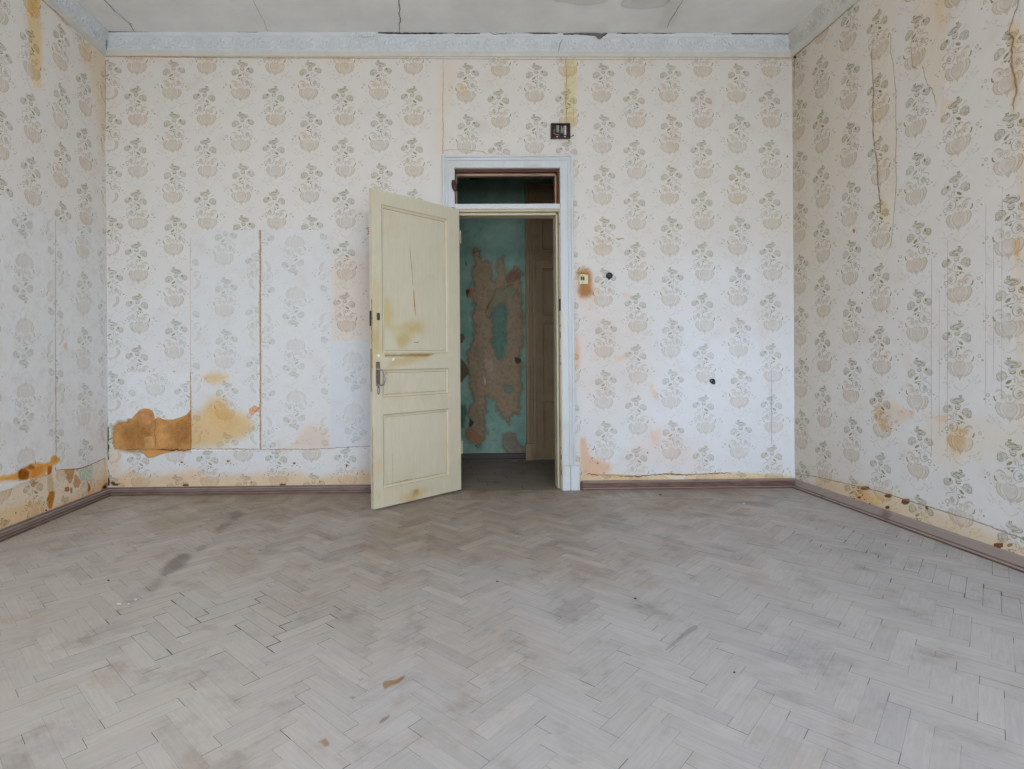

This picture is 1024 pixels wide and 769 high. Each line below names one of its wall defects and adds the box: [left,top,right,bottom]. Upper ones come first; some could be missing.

peeling [460,248,524,445]
peeling [113,406,191,458]
peeling [64,462,100,493]